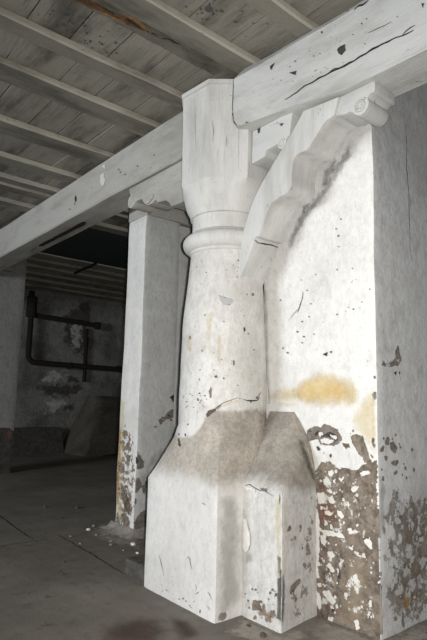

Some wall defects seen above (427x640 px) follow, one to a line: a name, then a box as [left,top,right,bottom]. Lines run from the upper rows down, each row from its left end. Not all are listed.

rust [73,0,148,31]
crack [285,22,415,100]
damp [64,302,90,358]
spalling [382,345,401,375]
damp [277,377,354,402]
spalling [153,395,174,428]
spalling [117,451,144,478]
spalling [116,478,148,529]
spalling [287,424,427,640]
peeling [244,588,277,623]